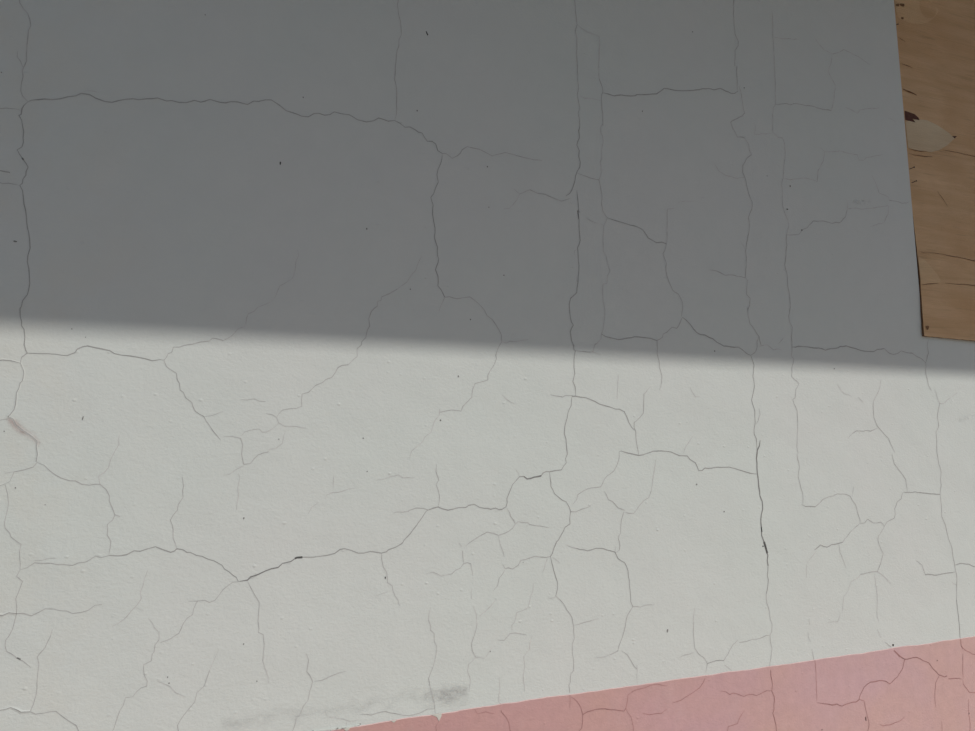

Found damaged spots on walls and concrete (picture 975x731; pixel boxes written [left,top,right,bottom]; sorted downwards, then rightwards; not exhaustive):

crack [315,43,975,731]